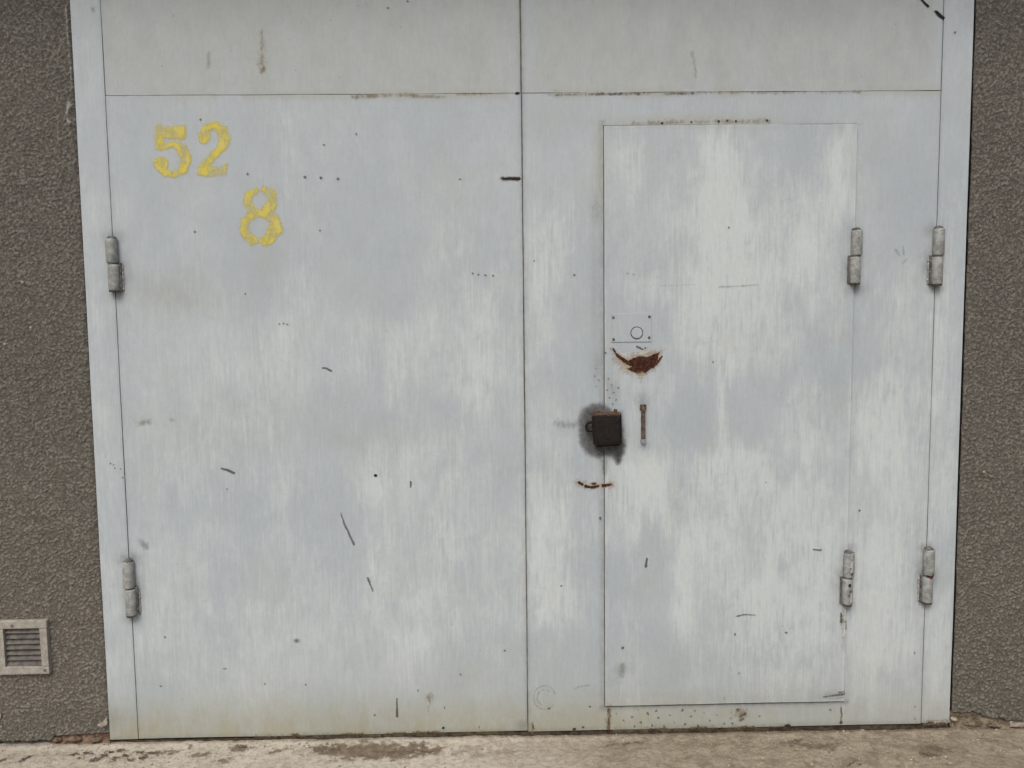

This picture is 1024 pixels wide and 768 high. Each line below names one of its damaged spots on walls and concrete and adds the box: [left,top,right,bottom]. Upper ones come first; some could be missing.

corrosion [613,346,663,374]